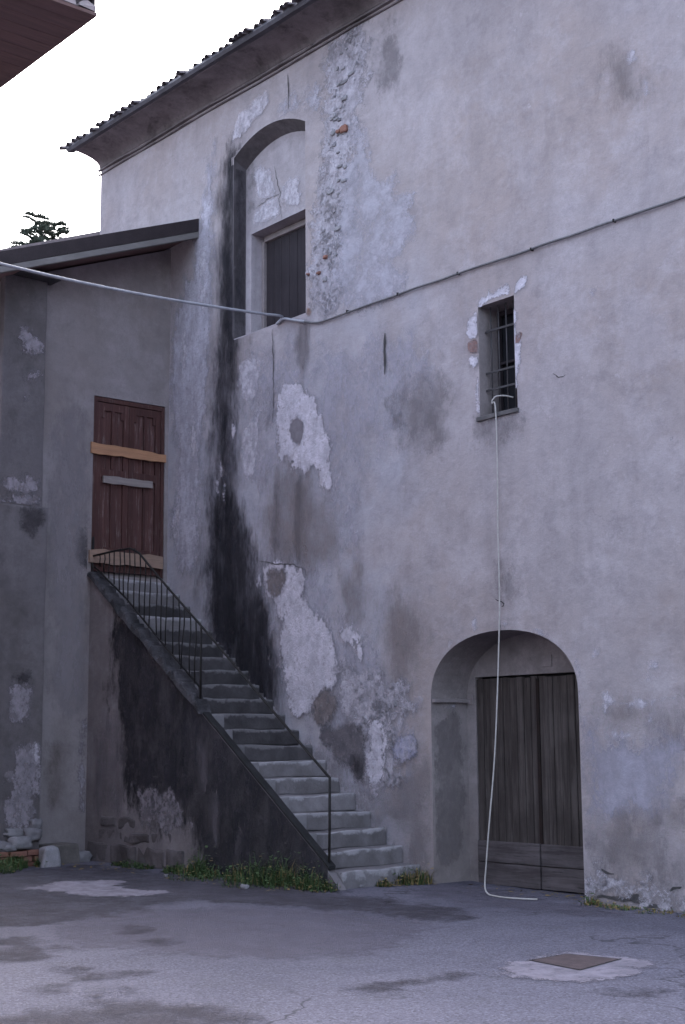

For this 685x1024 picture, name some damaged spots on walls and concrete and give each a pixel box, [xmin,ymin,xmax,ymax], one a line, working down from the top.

spalling [233,19,415,316]
spalling [466,275,528,420]
peeling [2,474,41,505]
leakage [204,149,279,706]
peeling [275,380,334,491]
peeling [7,673,35,725]
peeling [0,742,43,866]
peeling [137,786,194,832]
leakage [78,609,328,888]
peeling [256,559,423,800]